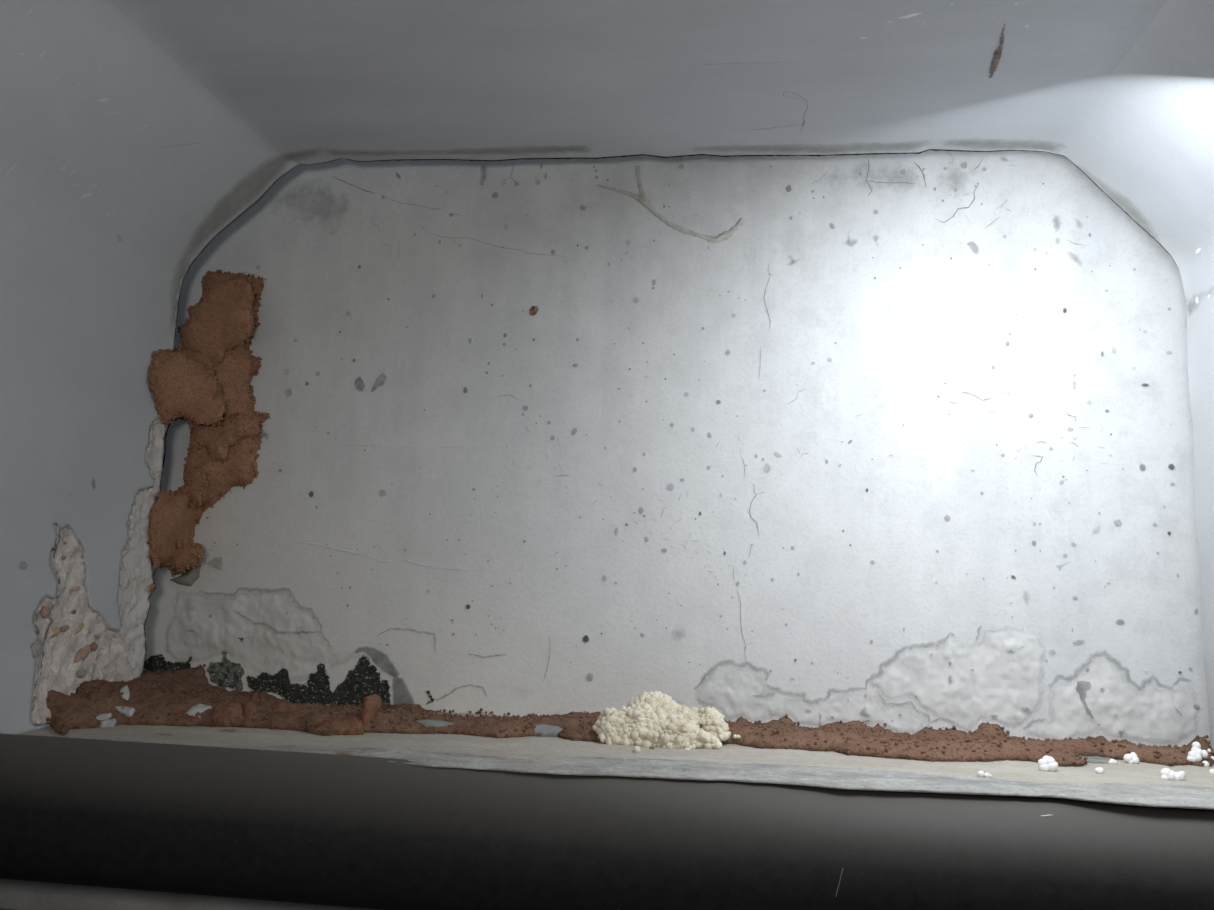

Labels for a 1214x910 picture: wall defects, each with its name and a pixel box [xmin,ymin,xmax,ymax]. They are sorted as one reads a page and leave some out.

rust [989,28,1004,78]
crack [175,149,1179,335]
crack [119,417,181,675]
leakage [144,654,192,673]
peeling [167,588,358,680]
leakage [207,647,434,706]
peeling [694,626,1197,742]